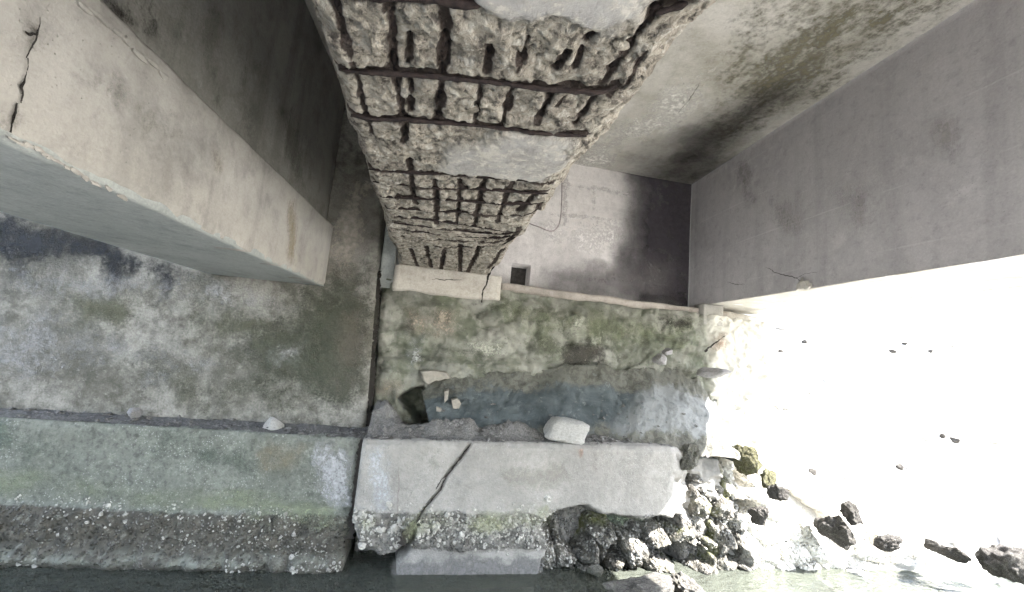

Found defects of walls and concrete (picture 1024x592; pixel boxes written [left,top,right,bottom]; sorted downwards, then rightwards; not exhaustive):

crack [9,21,41,133]
spalling [312,0,717,275]
leakage [545,0,942,328]
leakage [0,213,177,294]
rust [331,180,371,268]
crack [481,266,495,303]
efflorescence [468,342,502,356]
leakage [562,340,604,366]
crack [397,446,470,547]